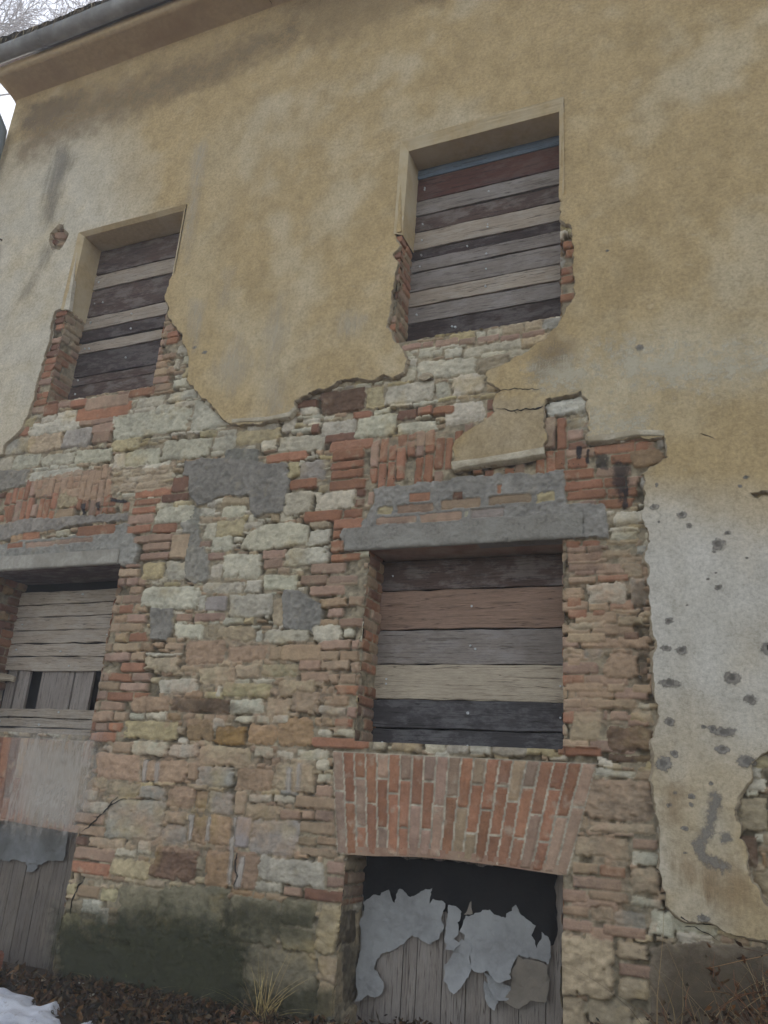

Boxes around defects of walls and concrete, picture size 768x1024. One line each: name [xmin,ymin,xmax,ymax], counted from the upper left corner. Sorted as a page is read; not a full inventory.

crack [497,387,547,413]
spalling [0,202,768,944]
water stain [692,791,732,874]
peeling [355,889,551,1011]